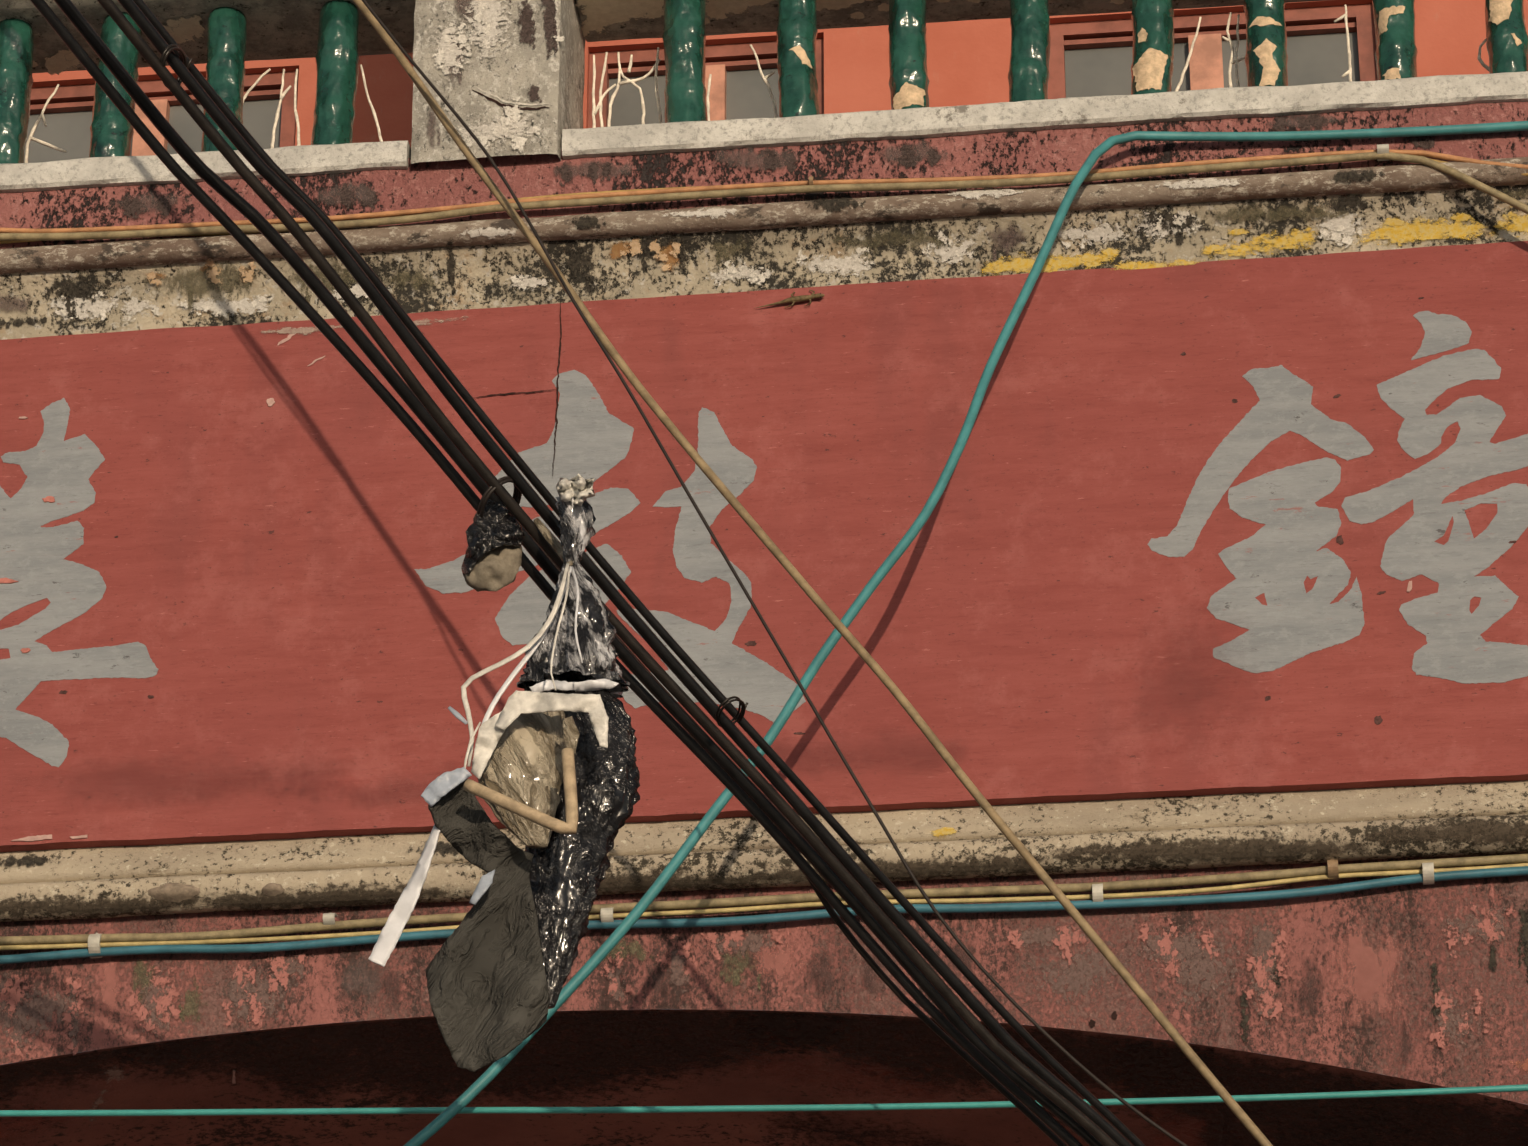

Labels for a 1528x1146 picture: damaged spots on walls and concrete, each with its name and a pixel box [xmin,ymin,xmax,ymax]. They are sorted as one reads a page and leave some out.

peeling [789,45,812,69]
peeling [1132,28,1168,92]
peeling [1249,16,1282,86]
peeling [1378,6,1405,36]
peeling [1488,0,1522,46]
peeling [893,82,926,110]
damp [1135,169,1385,245]
damp [384,227,516,295]
damp [627,208,751,274]
damp [0,268,110,329]
damp [857,818,1528,885]
damp [0,882,469,919]